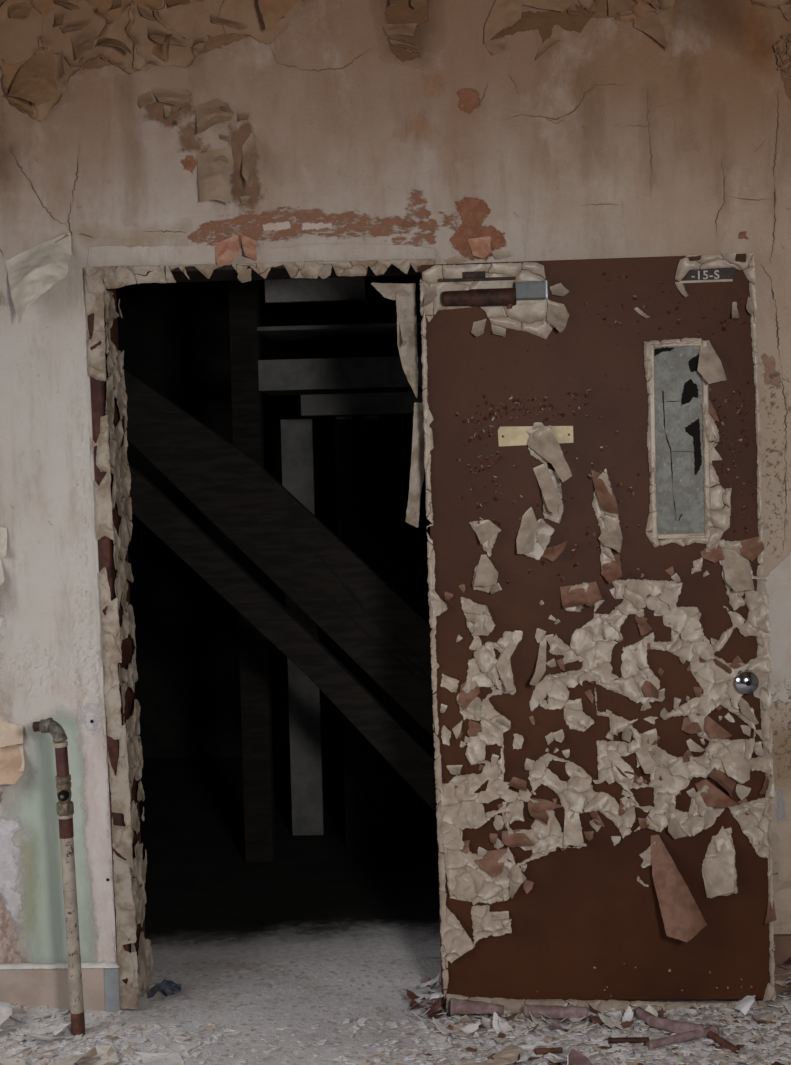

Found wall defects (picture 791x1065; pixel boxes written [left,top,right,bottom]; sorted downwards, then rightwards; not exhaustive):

peeling [0,0,307,122]
flaking render [388,37,421,62]
peeling [484,0,660,60]
peeling [774,33,791,100]
crack [11,147,93,255]
peeling [0,233,71,323]
crack [715,89,790,549]
peeling [84,88,781,1014]